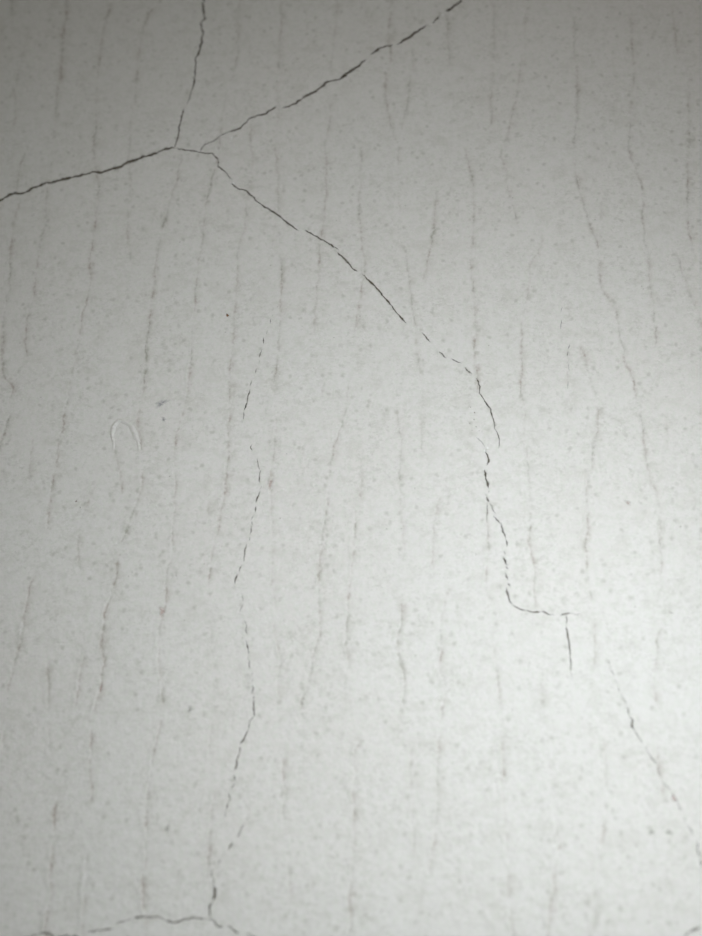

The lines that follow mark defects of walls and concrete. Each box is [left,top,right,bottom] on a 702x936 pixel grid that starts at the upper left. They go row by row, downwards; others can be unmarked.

crack [0,0,578,668]
crack [136,874,250,935]